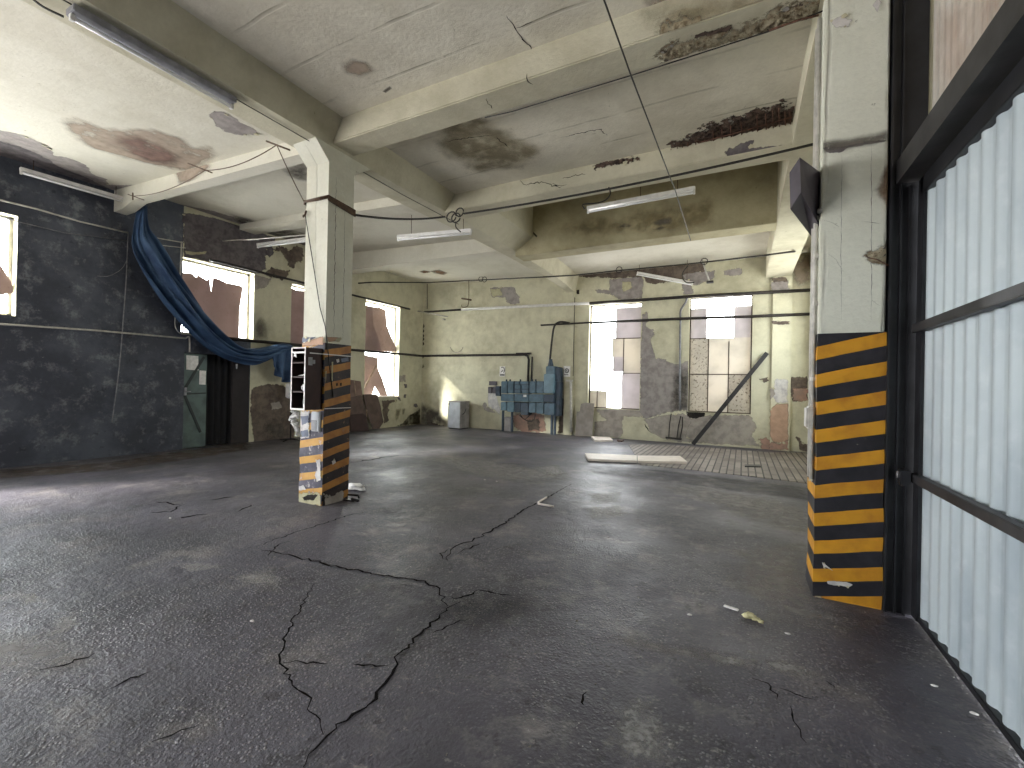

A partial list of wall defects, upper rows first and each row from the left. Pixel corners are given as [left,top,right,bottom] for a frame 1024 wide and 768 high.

spalling [655,0,852,64]
leakage [346,62,369,74]
leakage [67,123,210,182]
peeling [209,111,259,136]
spalling [666,99,795,156]
peeling [594,312,808,452]
peeling [250,384,310,442]
crack [439,484,571,560]
crack [40,654,93,670]
crack [108,671,152,690]
crack [258,513,512,767]
crack [753,678,835,741]